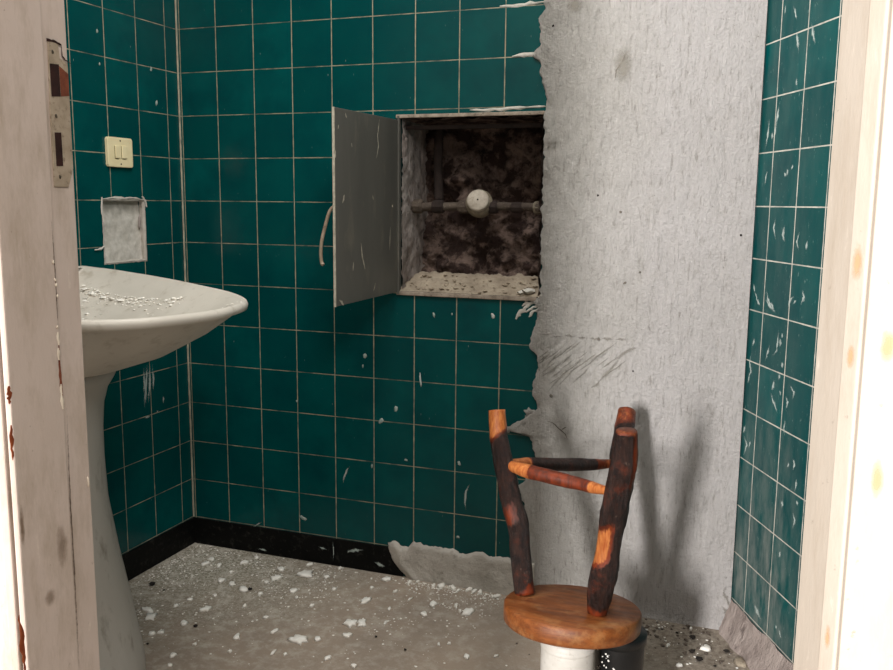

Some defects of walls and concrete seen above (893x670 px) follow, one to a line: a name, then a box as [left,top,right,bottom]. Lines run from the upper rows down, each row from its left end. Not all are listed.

spalling [540,334,623,387]